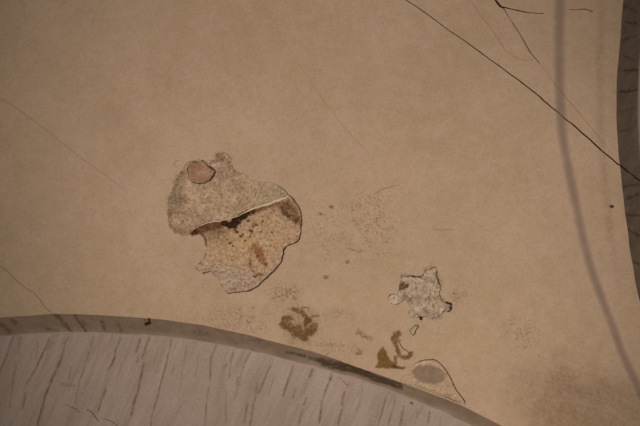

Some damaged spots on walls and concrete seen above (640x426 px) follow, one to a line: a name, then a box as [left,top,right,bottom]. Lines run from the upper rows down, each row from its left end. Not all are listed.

crack [406,0,640,181]
flaking render [167,152,303,294]
damp [279,308,319,341]
flaking render [389,267,453,335]
damp [287,331,413,388]
peeling [400,359,466,405]